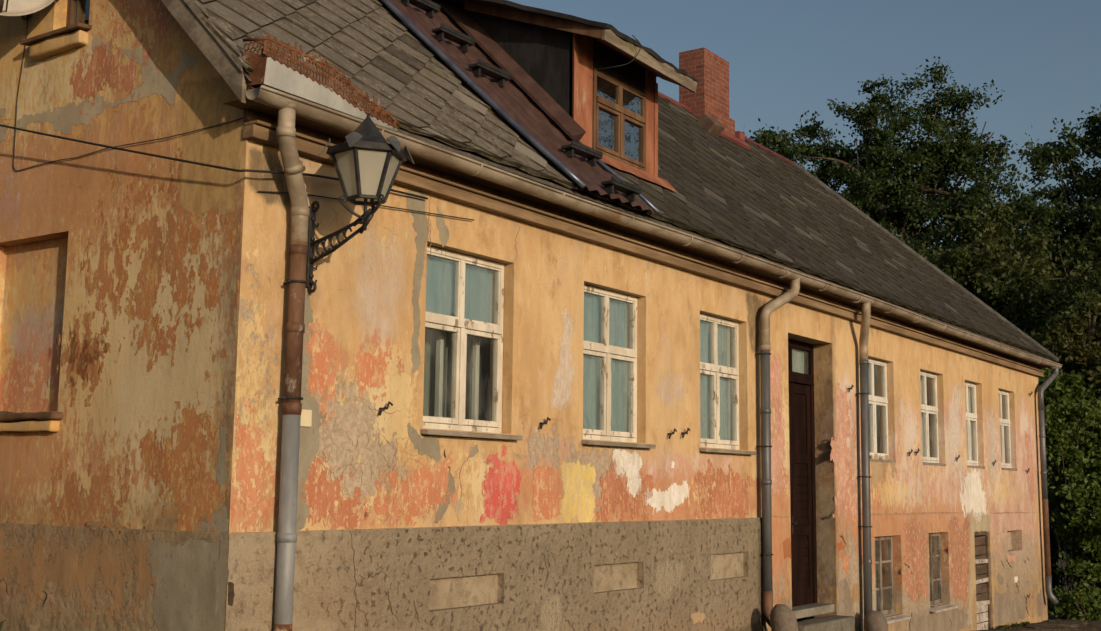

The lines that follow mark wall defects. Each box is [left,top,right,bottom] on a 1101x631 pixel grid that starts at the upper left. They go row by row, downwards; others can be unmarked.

peeling [70,0,174,117]
peeling [0,148,242,413]
rust [282,244,308,415]
peeling [303,319,405,423]
peeling [49,454,131,528]
peeling [139,390,279,532]
peeling [299,452,457,530]
crack [311,405,471,631]
peeling [596,459,657,522]
peeling [694,459,753,519]
peeling [830,383,859,523]